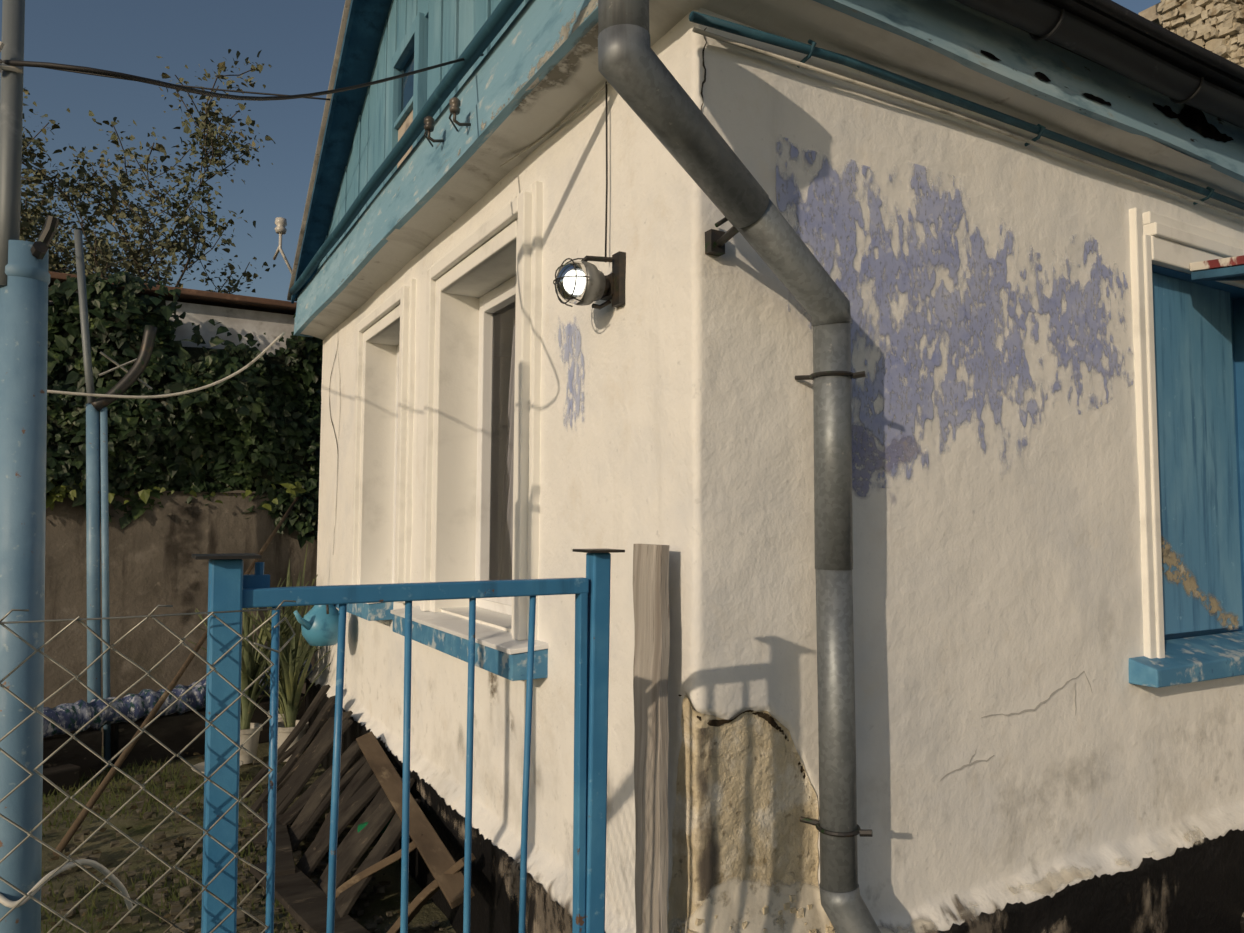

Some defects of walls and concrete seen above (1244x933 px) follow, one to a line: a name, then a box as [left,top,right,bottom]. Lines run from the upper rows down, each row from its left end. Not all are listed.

peeling [776,138,1133,496]
peeling [558,324,584,427]
crack [981,671,1092,718]
crack [939,751,994,782]
flaking render [667,695,835,933]
peeling [920,924,937,933]
peeling [942,896,1006,933]